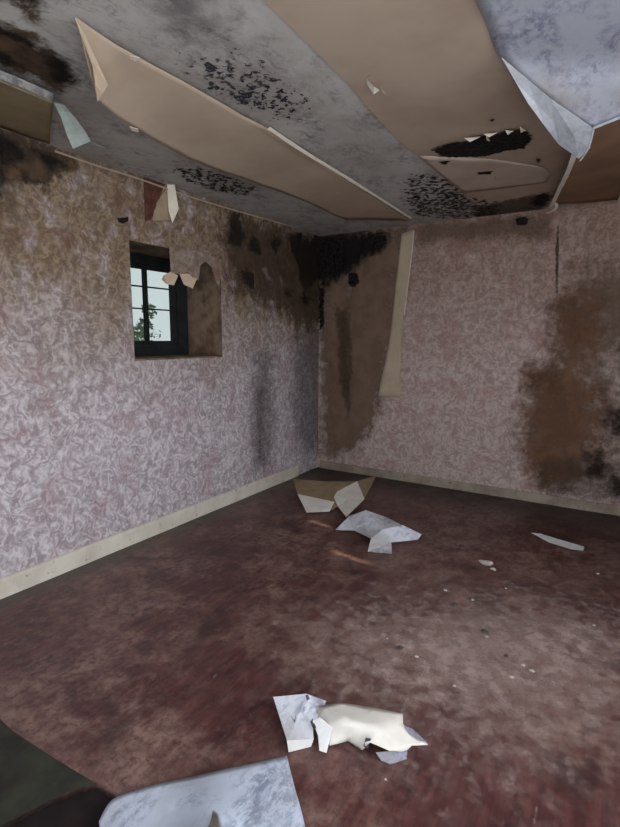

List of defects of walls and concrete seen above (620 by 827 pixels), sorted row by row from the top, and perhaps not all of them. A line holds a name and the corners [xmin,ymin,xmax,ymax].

water stain [10,0,40,22]
water stain [0,21,80,192]
water stain [176,48,310,125]
peeling [264,0,571,206]
peeling [143,177,179,223]
water stain [174,166,259,196]
water stain [400,173,551,241]
water stain [431,127,532,165]
water stain [215,209,388,337]
peeling [319,225,409,459]